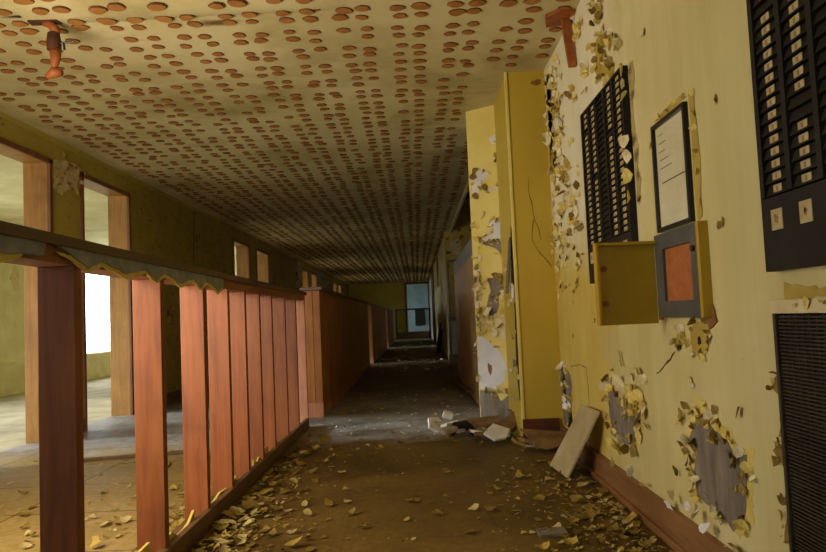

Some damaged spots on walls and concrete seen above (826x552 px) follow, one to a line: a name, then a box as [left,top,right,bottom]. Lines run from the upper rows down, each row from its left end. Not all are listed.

peeling [52,152,86,200]
peeling [463,168,498,199]
peeling [530,0,642,304]
flaking render [446,211,520,421]
peeling [668,304,718,361]
peeling [84,461,137,548]
peeling [168,454,185,532]
peeling [192,388,463,552]
peeling [455,449,674,552]
flaking render [598,350,649,477]
flaking render [672,399,756,552]
peeling [771,418,783,467]